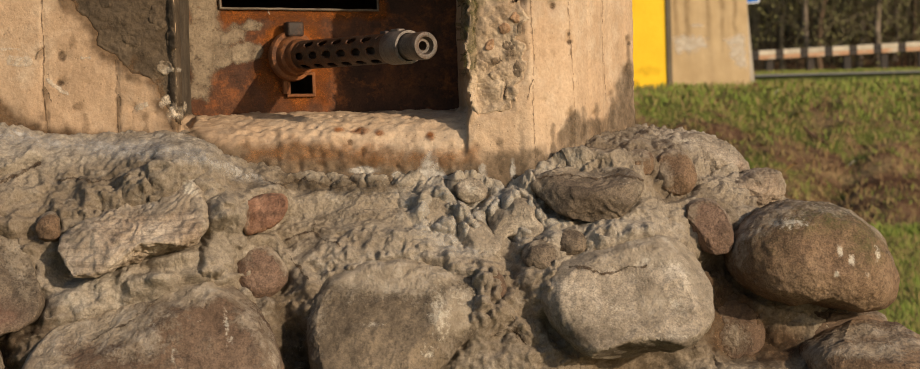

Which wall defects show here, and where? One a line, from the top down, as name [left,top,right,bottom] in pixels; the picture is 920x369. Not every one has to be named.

spalling [73,0,185,125]
spalling [450,0,530,115]
leakage [559,65,635,148]
crack [0,161,41,183]
crack [58,173,130,183]